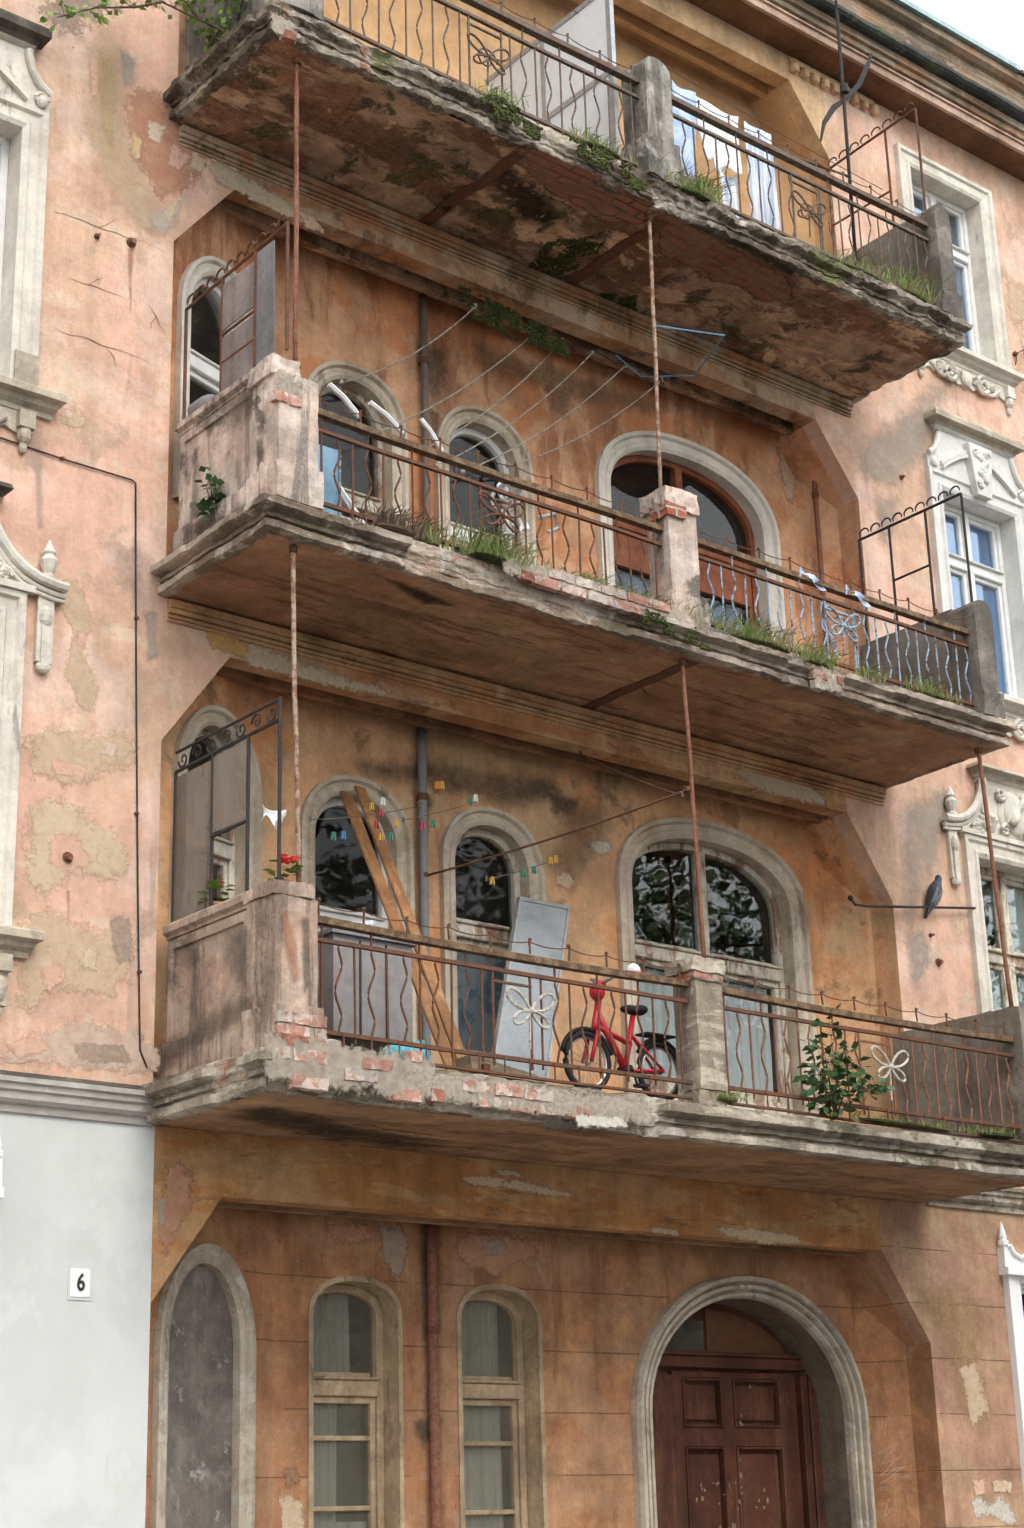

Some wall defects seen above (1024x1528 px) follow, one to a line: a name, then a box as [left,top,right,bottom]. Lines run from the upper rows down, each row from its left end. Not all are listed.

flaking render [123,87,324,234]
leakage [496,170,551,224]
leakage [478,346,655,414]
flaking render [502,556,686,623]
peeling [58,578,98,711]
flaking render [264,1009,652,1130]
leakage [238,1108,436,1150]
peeling [460,1169,575,1198]
peeling [455,1232,541,1277]
peeling [925,1290,989,1427]
peeling [279,1466,305,1528]
peeling [971,1477,1016,1526]